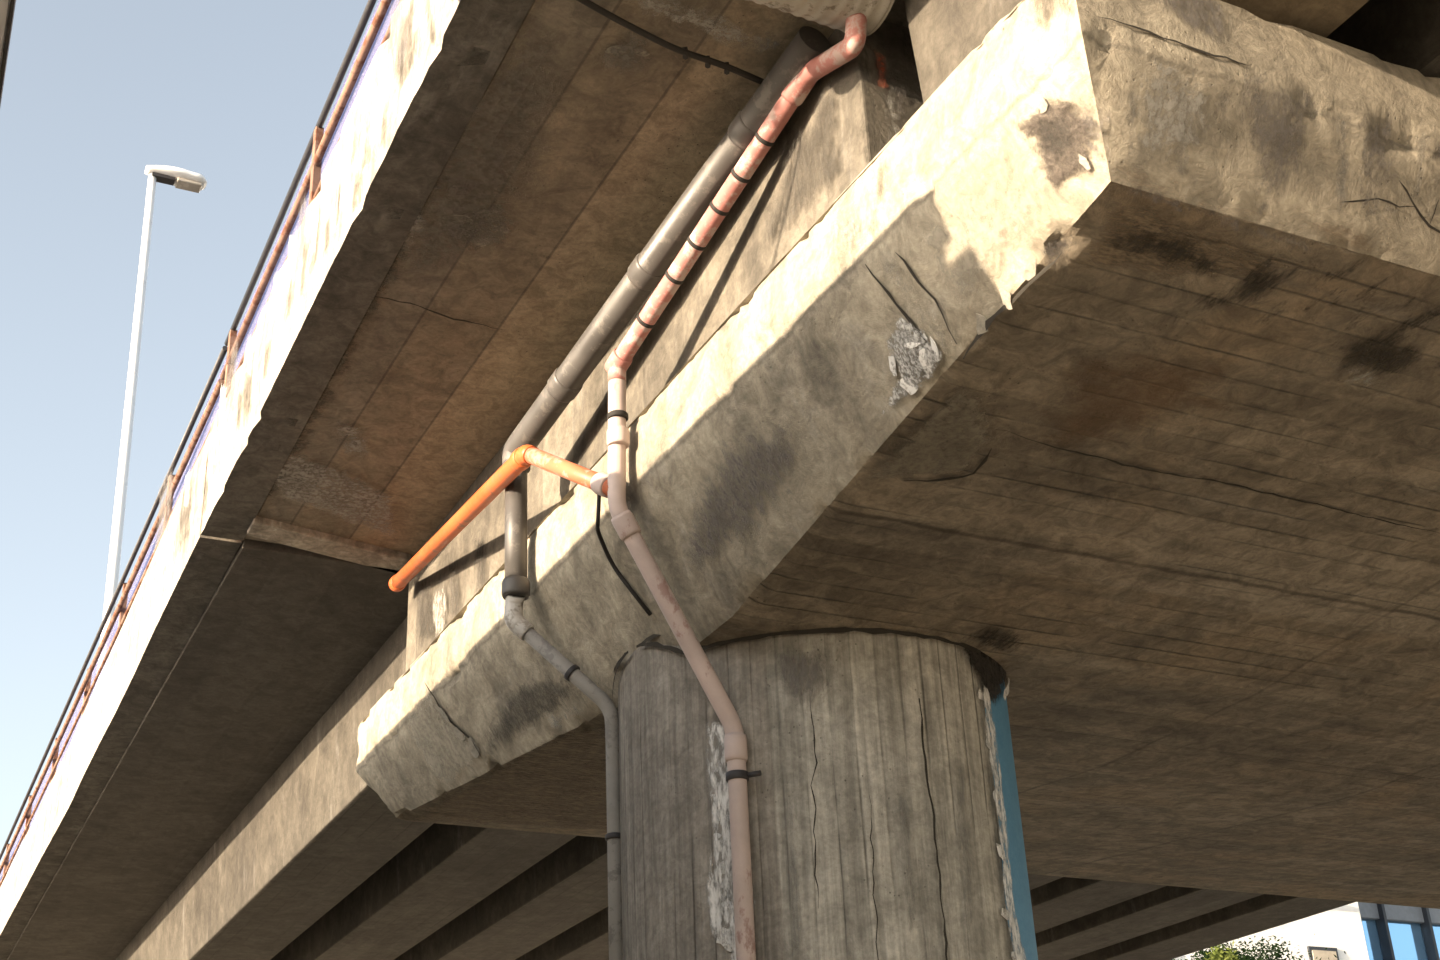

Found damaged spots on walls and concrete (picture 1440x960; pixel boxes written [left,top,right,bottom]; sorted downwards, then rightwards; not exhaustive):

crack [1100,17,1249,66]
crack [1344,180,1440,233]
crack [865,252,957,344]
peeling [888,335,941,395]
spalling [963,237,1073,359]
damp [1340,299,1440,383]
peeling [708,724,736,960]
crack [810,703,819,908]
crack [918,698,948,960]
peeling [963,629,1026,960]